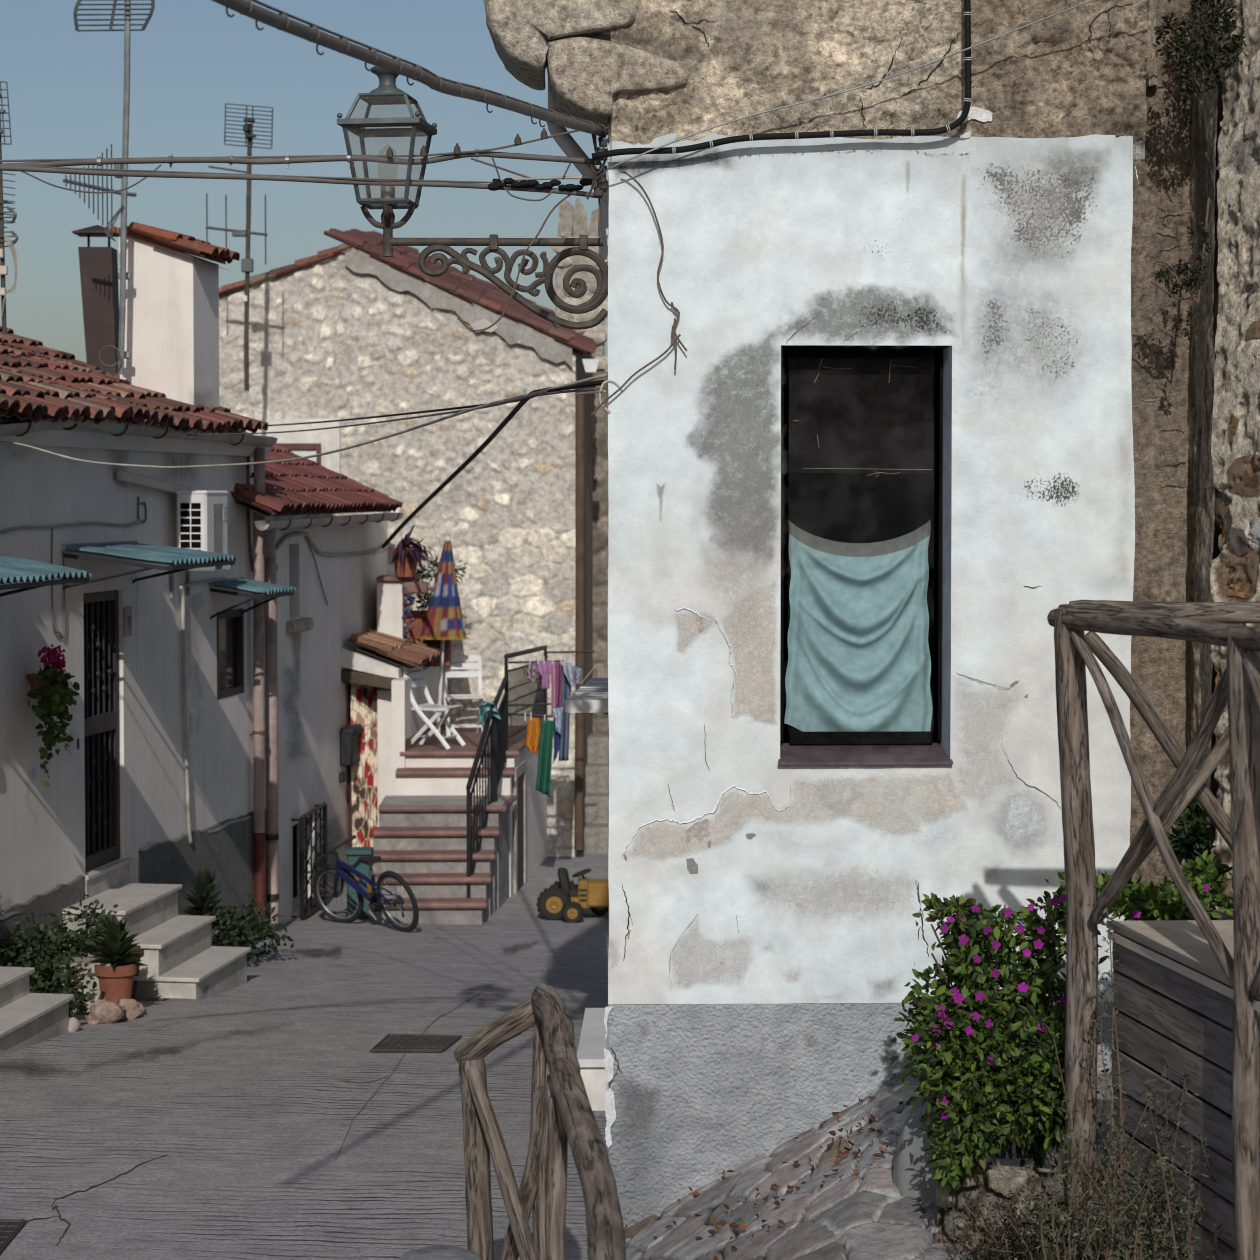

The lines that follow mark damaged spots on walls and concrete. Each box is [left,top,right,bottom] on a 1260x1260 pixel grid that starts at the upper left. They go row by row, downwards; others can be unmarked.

crack [670,11,722,47]
water stain [978,156,1096,261]
water stain [981,299,1078,378]
water stain [699,288,949,556]
water stain [1024,473,1079,506]
peeling [675,584,775,721]
crack [28,1155,167,1245]